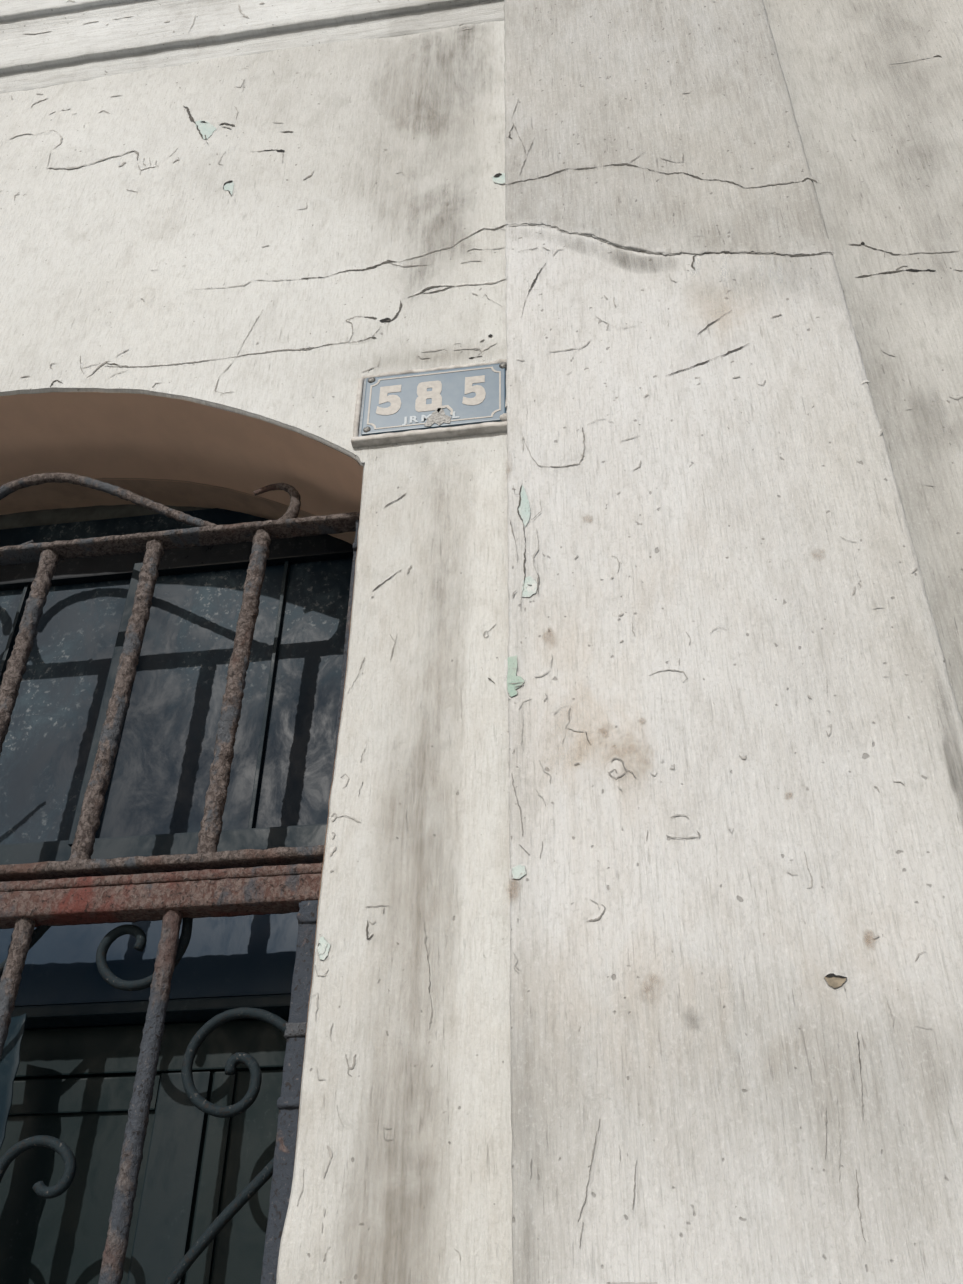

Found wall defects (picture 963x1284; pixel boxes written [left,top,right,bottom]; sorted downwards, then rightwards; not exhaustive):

crack [506,154,820,188]
crack [850,242,963,278]
crack [20,224,562,396]
peeling [510,484,543,610]
peeling [503,654,553,700]